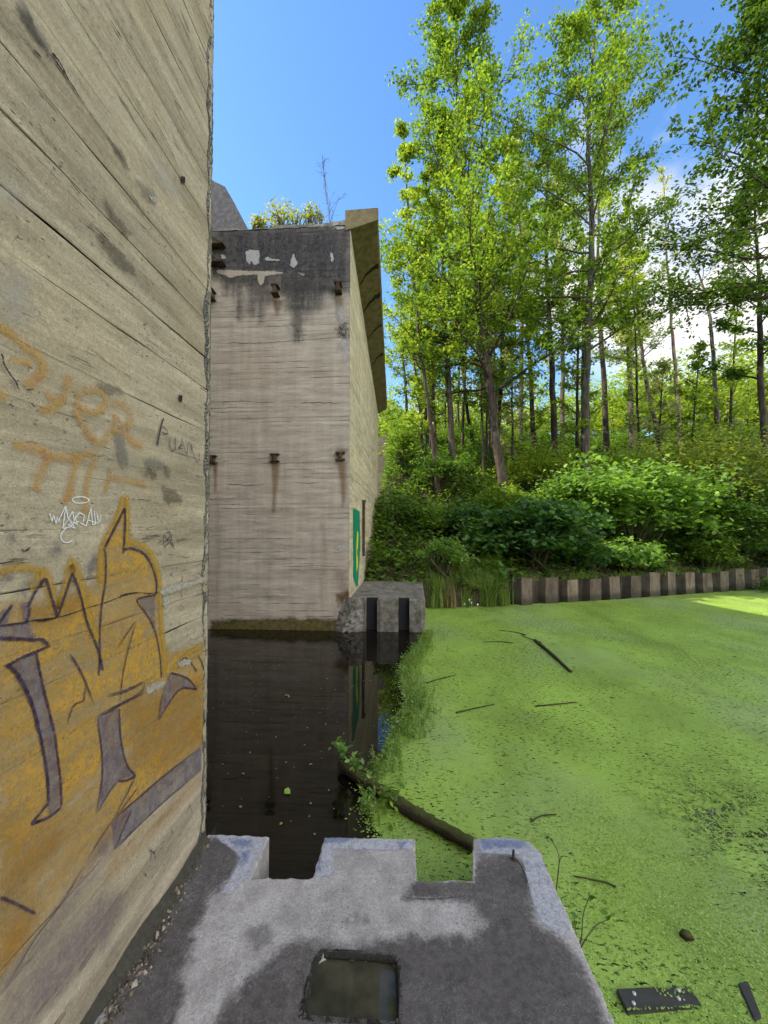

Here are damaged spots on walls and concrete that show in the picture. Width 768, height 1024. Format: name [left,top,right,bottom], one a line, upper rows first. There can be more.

spalling [245,249,304,275]
leakage [214,226,350,338]